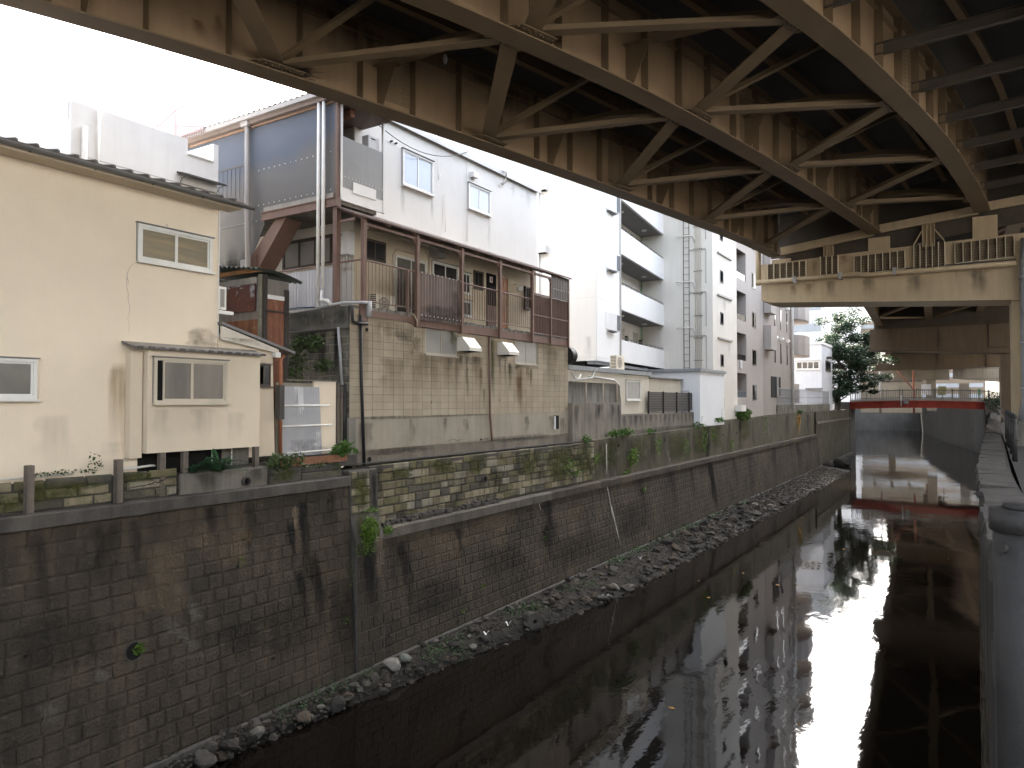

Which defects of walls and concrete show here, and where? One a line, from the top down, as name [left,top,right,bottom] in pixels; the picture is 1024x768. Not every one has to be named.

leakage [288,503,306,548]